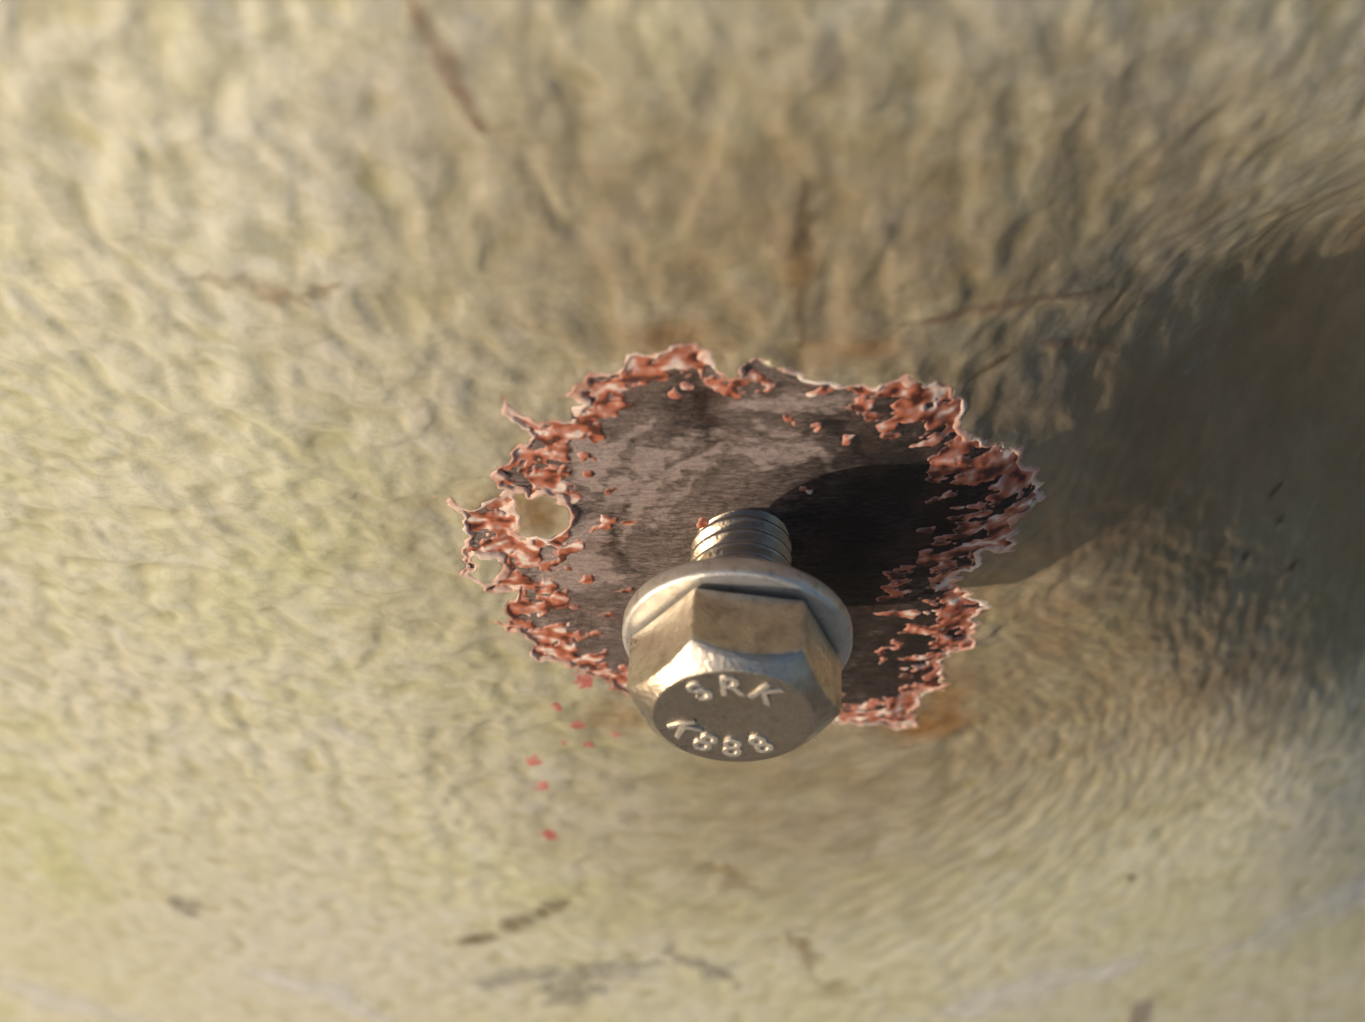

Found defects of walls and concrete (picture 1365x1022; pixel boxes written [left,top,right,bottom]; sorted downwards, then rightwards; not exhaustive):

peeling [432,342,1046,730]
rust [588,150,1365,768]